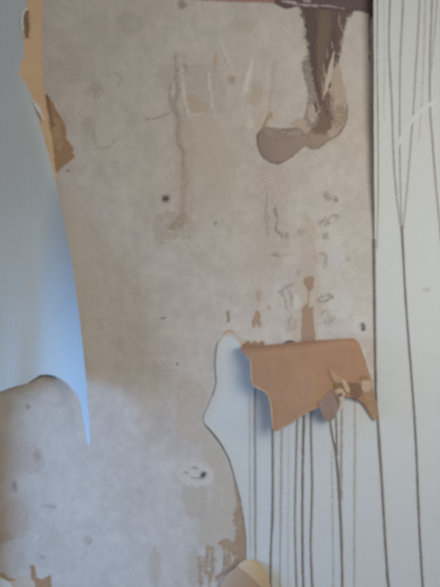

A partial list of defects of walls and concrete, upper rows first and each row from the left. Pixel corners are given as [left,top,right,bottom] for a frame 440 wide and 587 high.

water stain [290,7,355,149]
water stain [172,375,238,587]